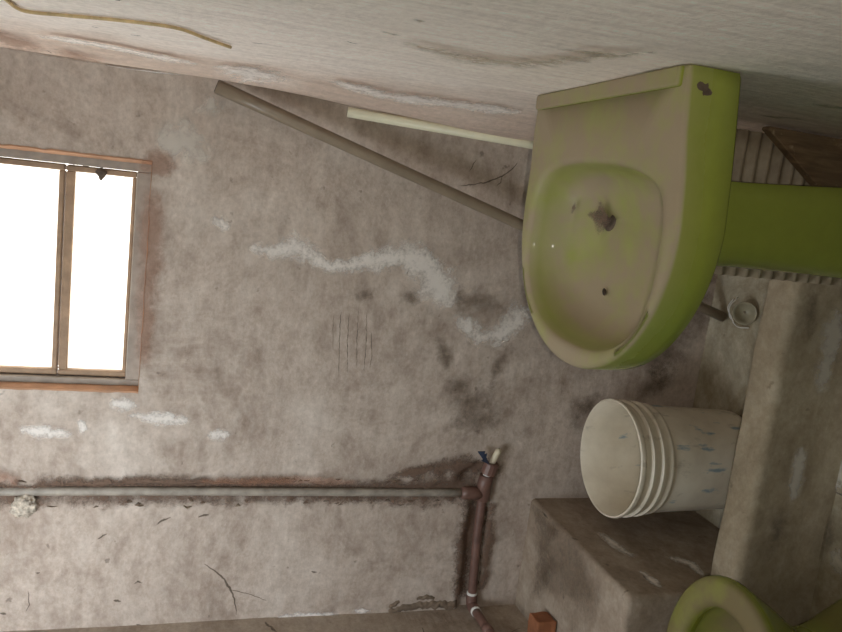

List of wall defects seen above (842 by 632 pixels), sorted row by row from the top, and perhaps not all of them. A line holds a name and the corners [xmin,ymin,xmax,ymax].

water stain [251,237,456,307]
water stain [456,306,529,347]